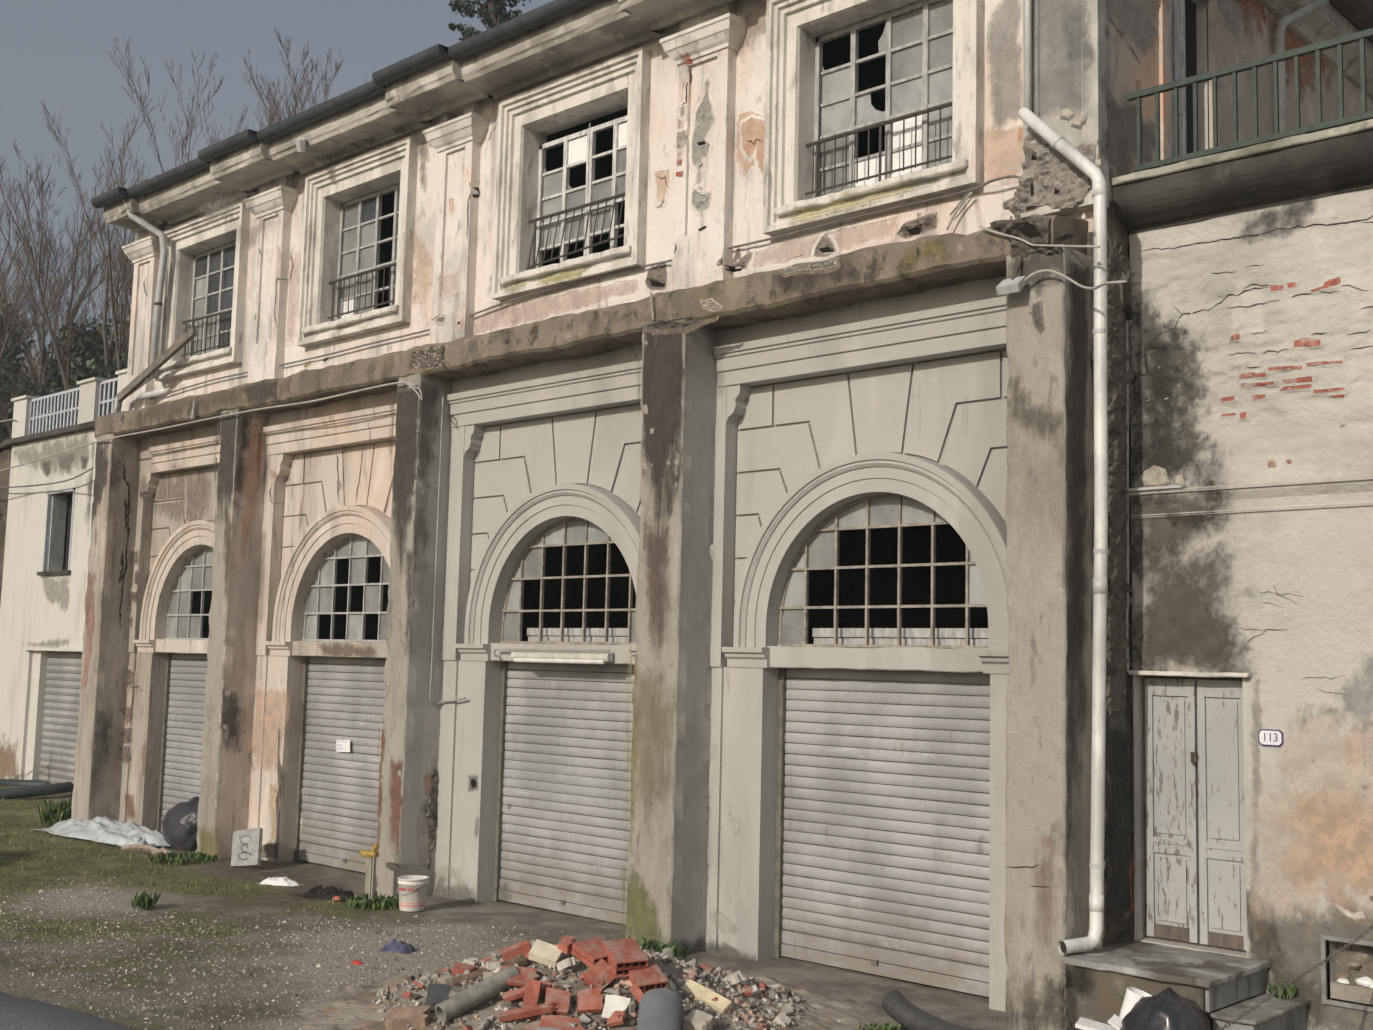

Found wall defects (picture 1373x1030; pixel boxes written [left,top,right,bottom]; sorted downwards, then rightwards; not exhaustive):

rust [1239,0,1332,102]
peeling [432,257,672,344]
peeling [651,73,765,231]
peeling [711,206,943,278]
spalling [970,108,1101,258]
crack [1133,215,1373,384]
flaking render [1219,334,1348,423]
crack [116,459,130,627]
leakage [139,380,285,596]
leakage [389,382,439,642]
leakage [1104,300,1244,922]
leakage [220,691,239,746]